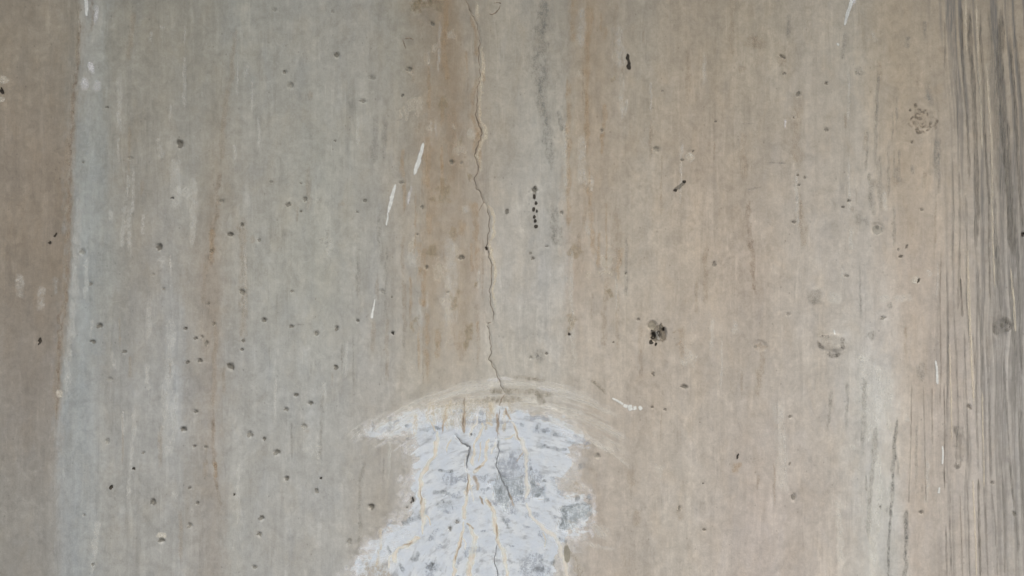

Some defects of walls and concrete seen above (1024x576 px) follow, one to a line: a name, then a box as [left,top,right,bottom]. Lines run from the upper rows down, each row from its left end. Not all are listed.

crack [467,2,510,498]
crack [456,399,472,492]
peeling [351,401,603,576]